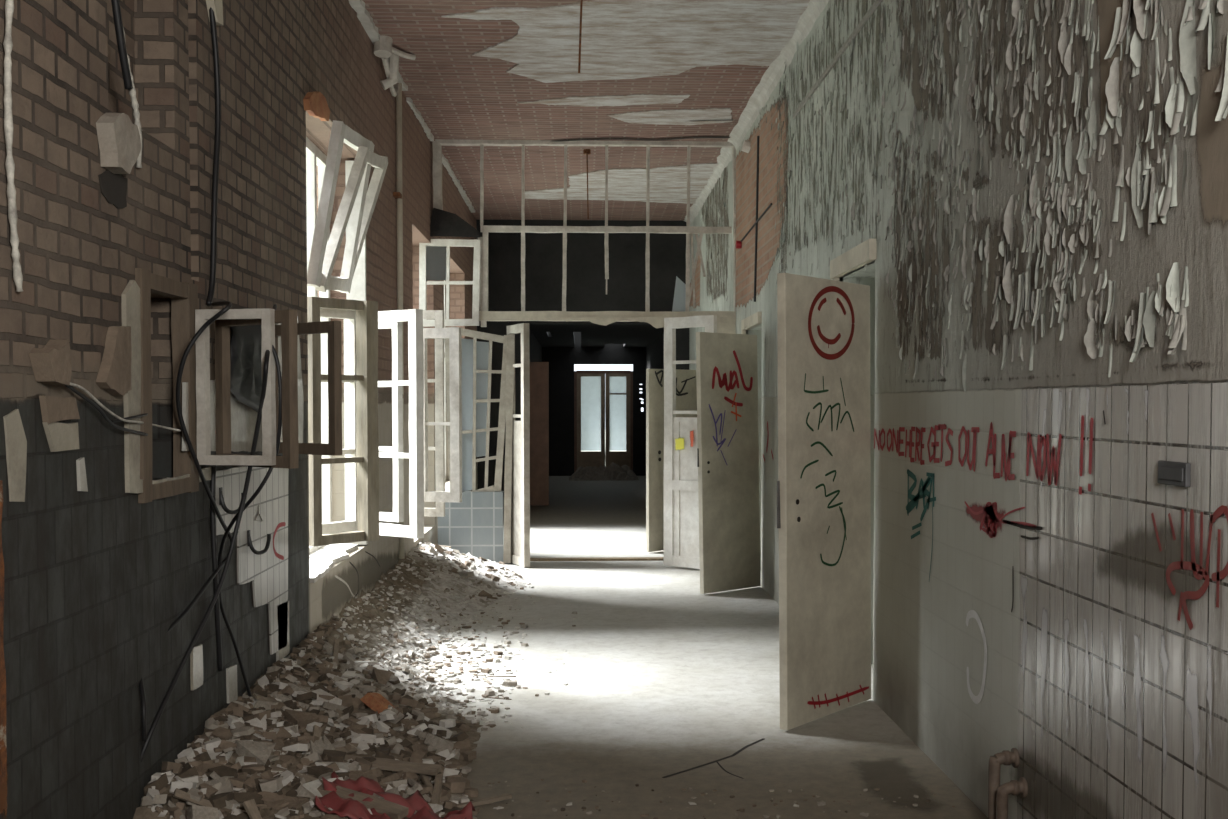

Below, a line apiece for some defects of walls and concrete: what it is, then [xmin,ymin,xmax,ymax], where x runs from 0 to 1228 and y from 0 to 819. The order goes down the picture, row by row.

spalling [303,92,330,121]